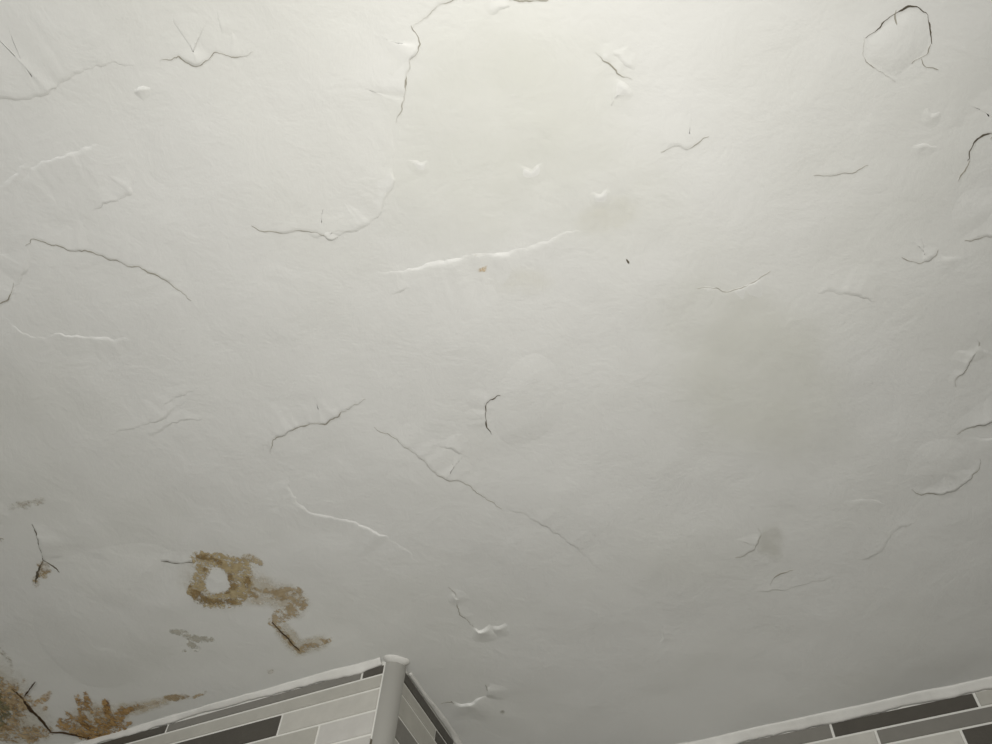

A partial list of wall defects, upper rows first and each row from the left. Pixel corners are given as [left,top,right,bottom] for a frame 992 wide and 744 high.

crack [957,88,992,179]
water stain [0,677,51,744]